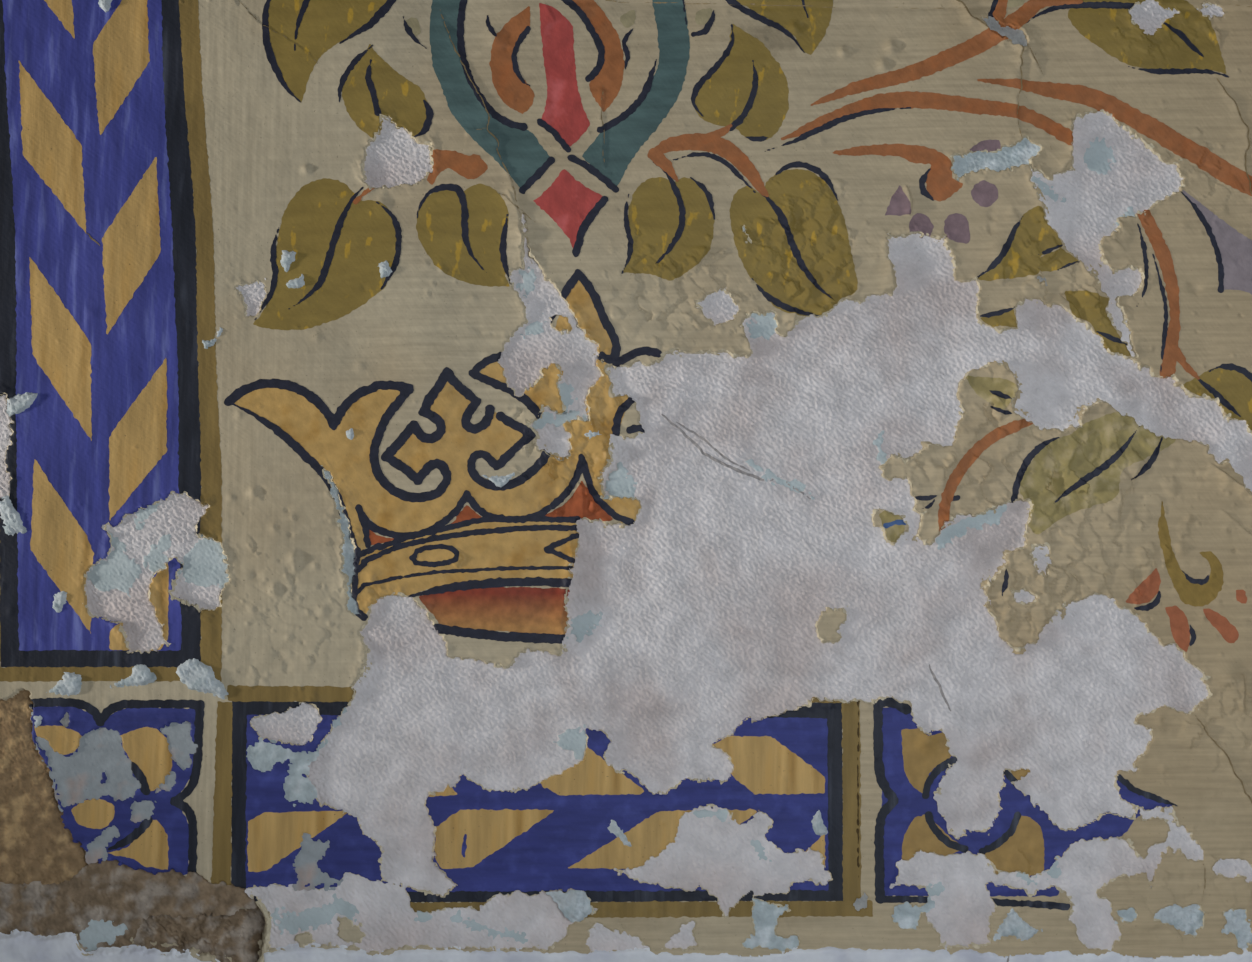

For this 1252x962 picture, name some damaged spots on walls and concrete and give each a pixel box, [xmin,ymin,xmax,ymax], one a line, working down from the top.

flaking render [202,327,223,349]
peeling [236,278,267,317]
flaking render [0,392,38,536]
flaking render [246,109,1252,953]
flaking render [52,591,67,613]
flaking render [82,491,230,688]
flaking render [46,672,82,697]
flaking render [176,658,229,700]
crack [1195,715,1252,802]
flaking render [0,689,598,962]